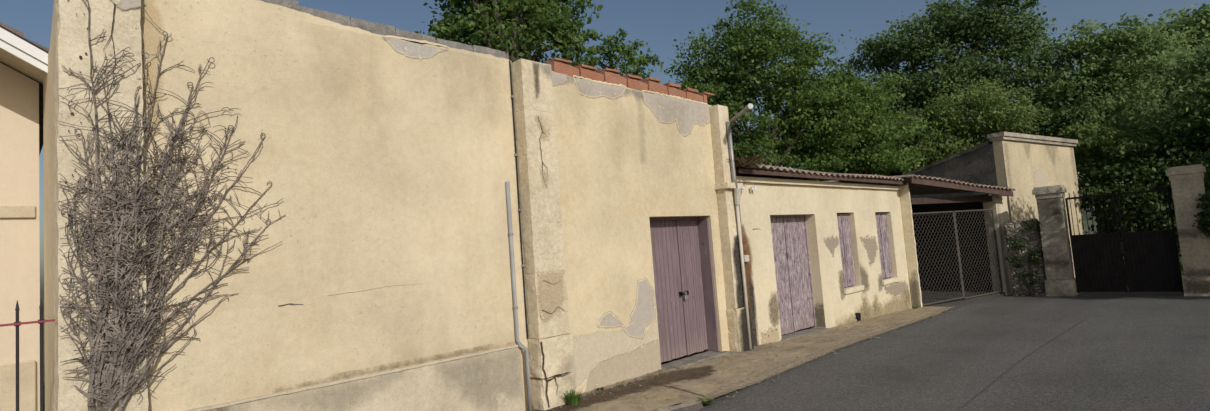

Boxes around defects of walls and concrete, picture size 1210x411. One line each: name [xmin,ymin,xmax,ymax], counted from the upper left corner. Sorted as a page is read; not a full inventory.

spalling [382,35,450,60]
spalling [552,72,626,100]
spalling [642,90,710,137]
water stain [734,235,778,351]
peeling [586,278,661,392]